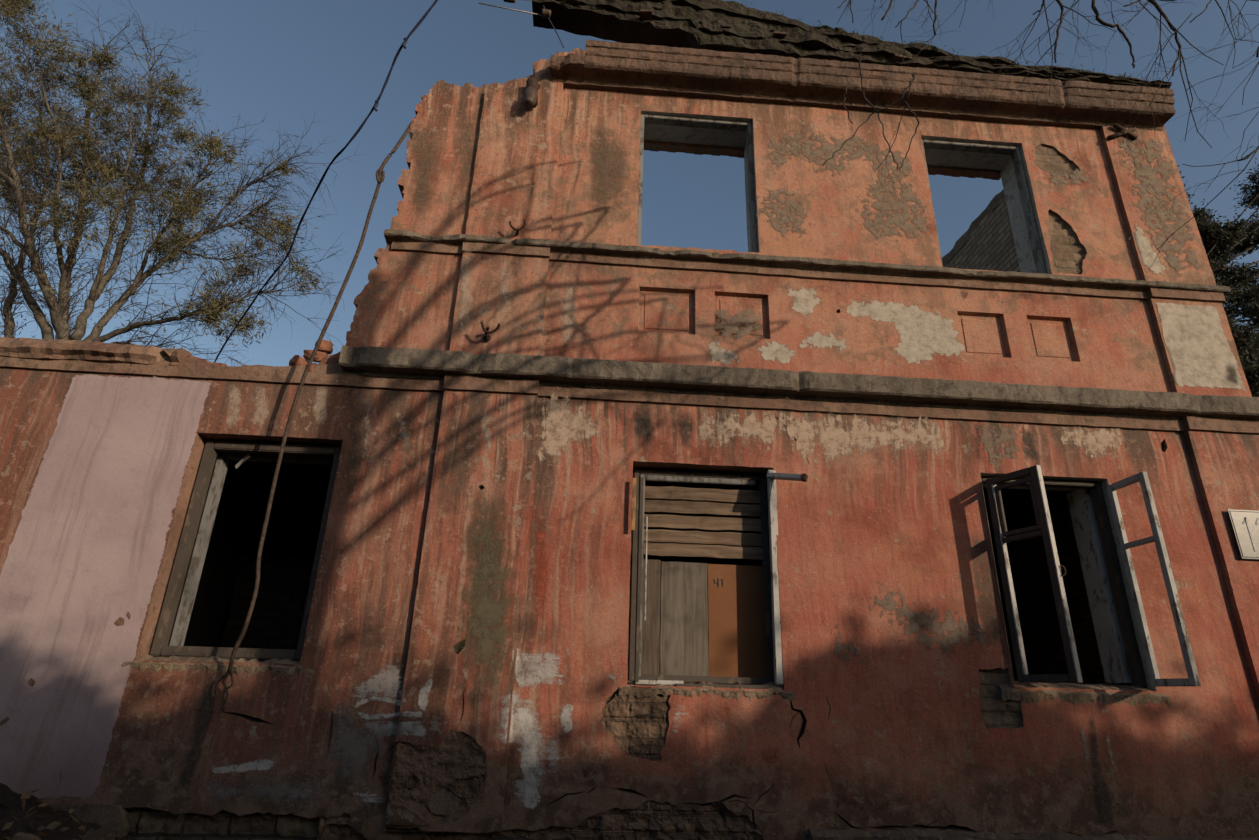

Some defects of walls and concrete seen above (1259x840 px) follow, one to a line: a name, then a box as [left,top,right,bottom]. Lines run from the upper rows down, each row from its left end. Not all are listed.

peeling [757,129,932,245]
peeling [836,300,965,364]
peeling [1155,302,1244,389]
peeling [699,410,944,464]
damp [463,499,511,685]
peeling [862,581,990,661]
crack [790,699,831,748]
flaking render [127,807,368,840]
crack [547,787,647,805]
flaking render [480,800,764,840]